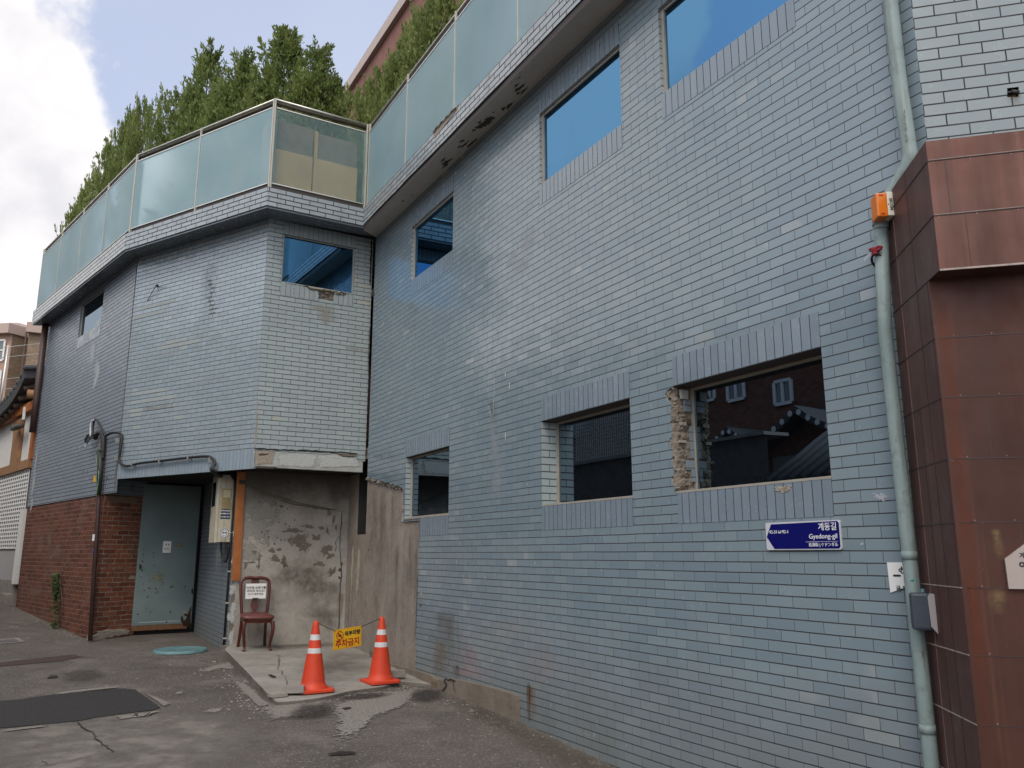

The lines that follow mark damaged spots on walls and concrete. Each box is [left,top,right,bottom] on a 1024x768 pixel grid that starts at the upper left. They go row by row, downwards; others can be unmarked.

spalling [433,105,459,138]
peeling [458,76,528,148]
peeling [231,501,343,593]
peeling [227,581,237,644]